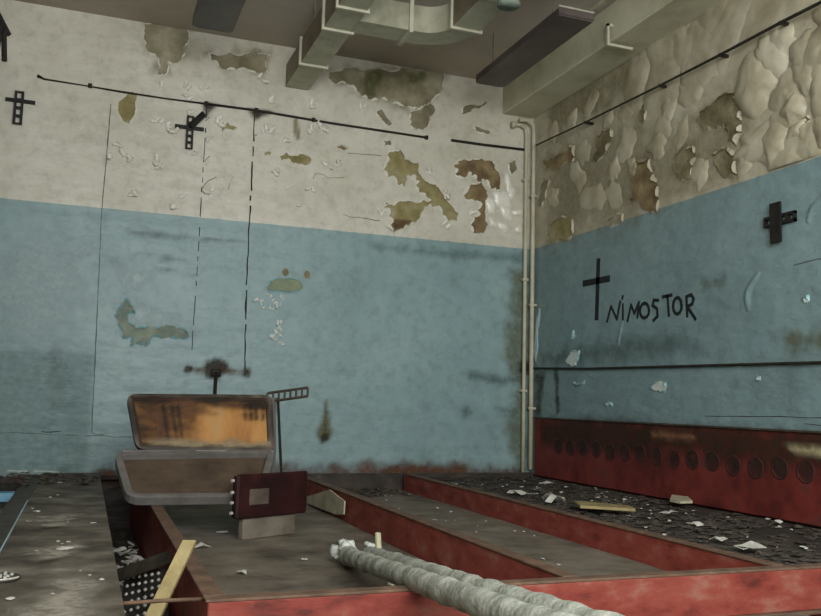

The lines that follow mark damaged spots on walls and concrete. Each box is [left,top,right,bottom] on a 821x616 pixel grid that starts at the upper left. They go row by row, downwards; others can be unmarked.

peeling [143,23,190,87]
peeling [208,50,271,83]
peeling [328,67,445,131]
peeling [378,140,517,235]
peeling [253,268,310,310]
peeling [114,298,190,347]